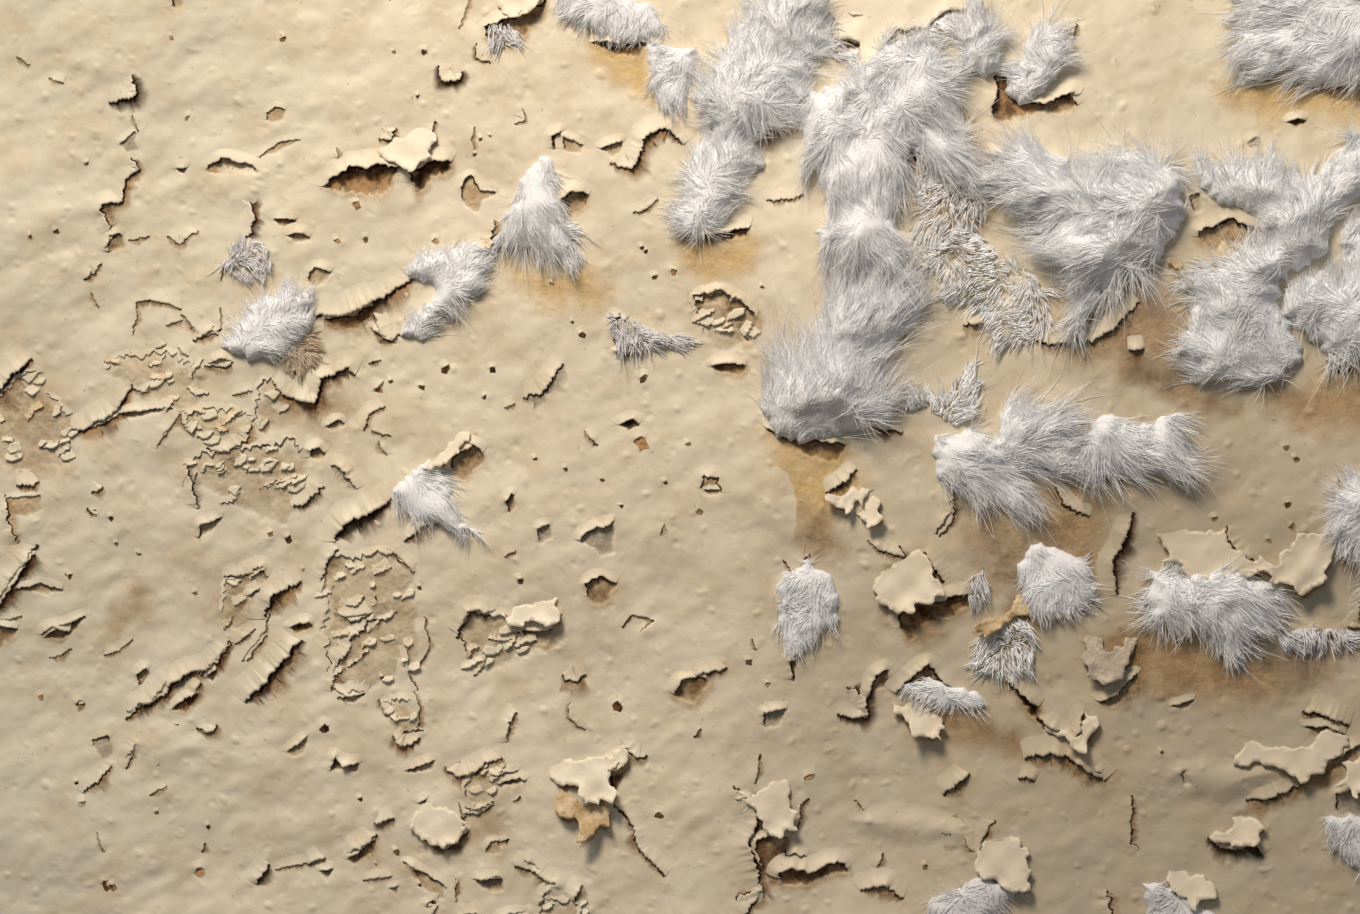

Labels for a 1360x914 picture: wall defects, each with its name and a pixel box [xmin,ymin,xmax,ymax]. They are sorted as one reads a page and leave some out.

leakage [1226,80,1360,113]
peeling [311,125,544,258]
leakage [923,167,975,227]
leakage [1074,298,1236,411]
peeling [0,317,530,877]
peeling [446,594,563,676]
peeling [548,739,648,843]
peeling [718,768,910,914]
peeling [836,549,975,740]
peeling [999,634,1141,785]
peeling [1156,511,1360,599]
peeling [1206,693,1360,857]